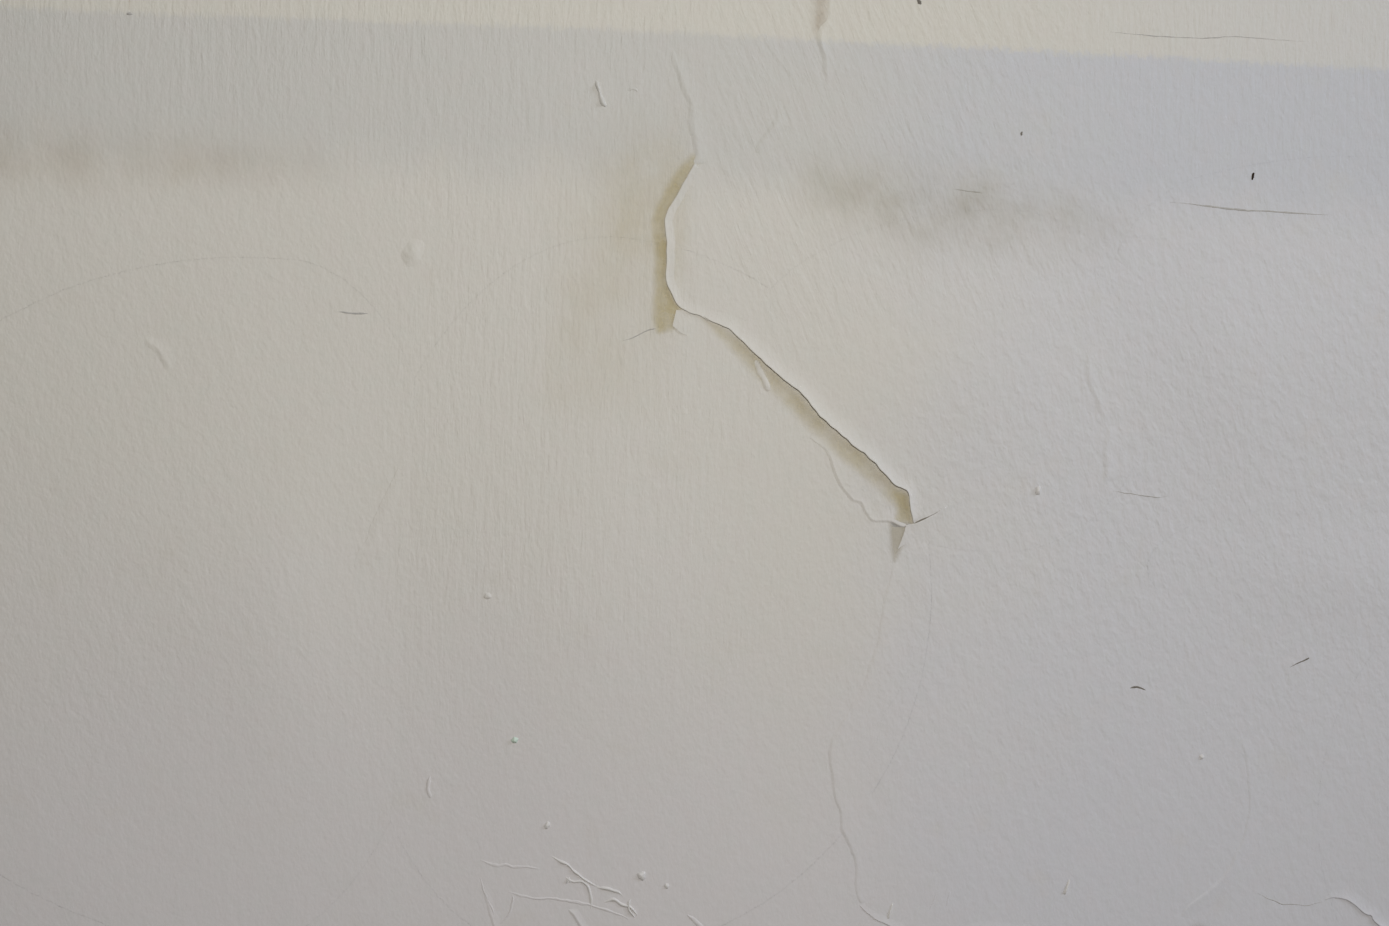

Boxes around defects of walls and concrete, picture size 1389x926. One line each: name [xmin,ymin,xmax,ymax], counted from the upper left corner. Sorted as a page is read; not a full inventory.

crack [623,49,962,926]
crack [1265,889,1389,926]